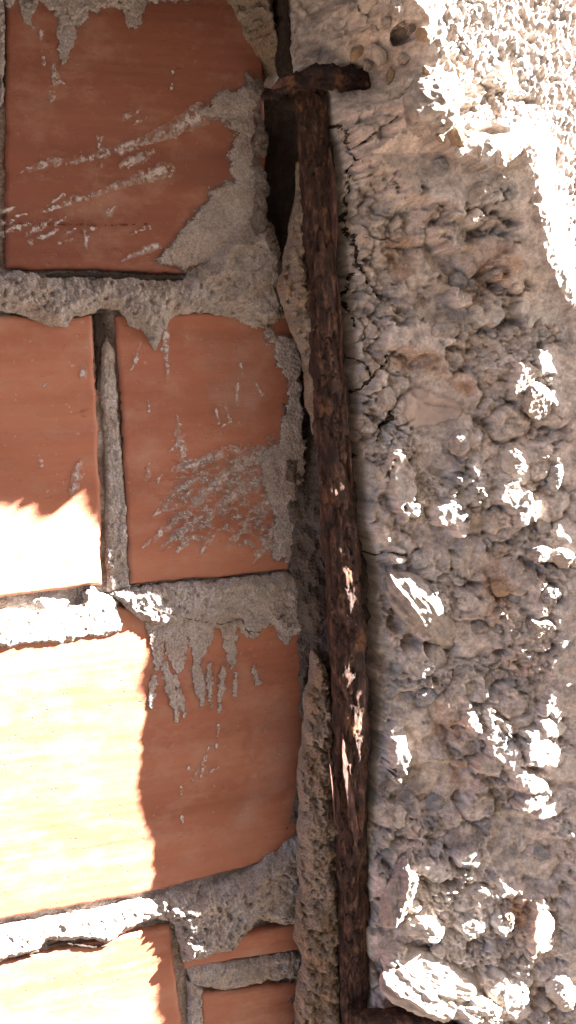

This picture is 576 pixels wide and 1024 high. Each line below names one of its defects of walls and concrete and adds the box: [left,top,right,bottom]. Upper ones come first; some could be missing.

spalling [263,72,279,89]
crack [329,115,398,327]
crack [345,355,388,394]
crack [351,402,398,458]
spalling [288,0,576,1024]
rust [328,731,365,855]